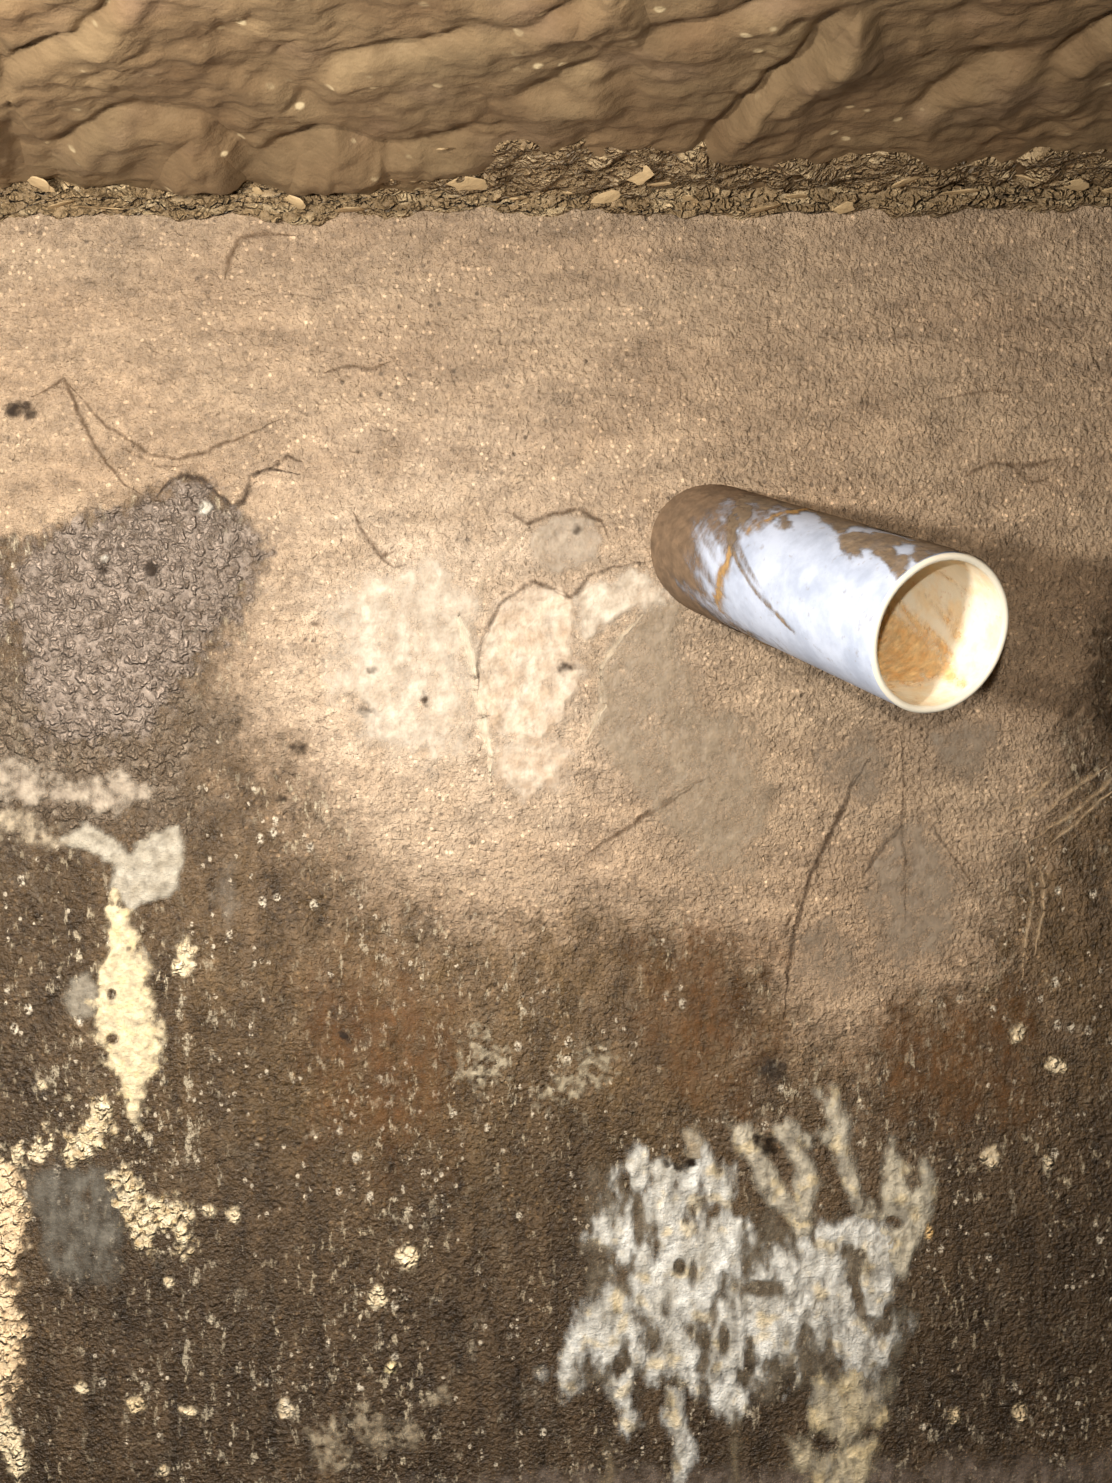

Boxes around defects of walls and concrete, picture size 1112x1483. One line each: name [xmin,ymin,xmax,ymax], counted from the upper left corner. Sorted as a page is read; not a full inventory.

crack [41,380,301,506]
water stain [0,758,184,1131]
crack [780,759,868,1017]
water stain [455,1030,508,1084]
water stain [543,1046,618,1097]
water stain [540,1090,935,1483]
water stain [311,1416,358,1469]
water stain [357,1406,418,1445]